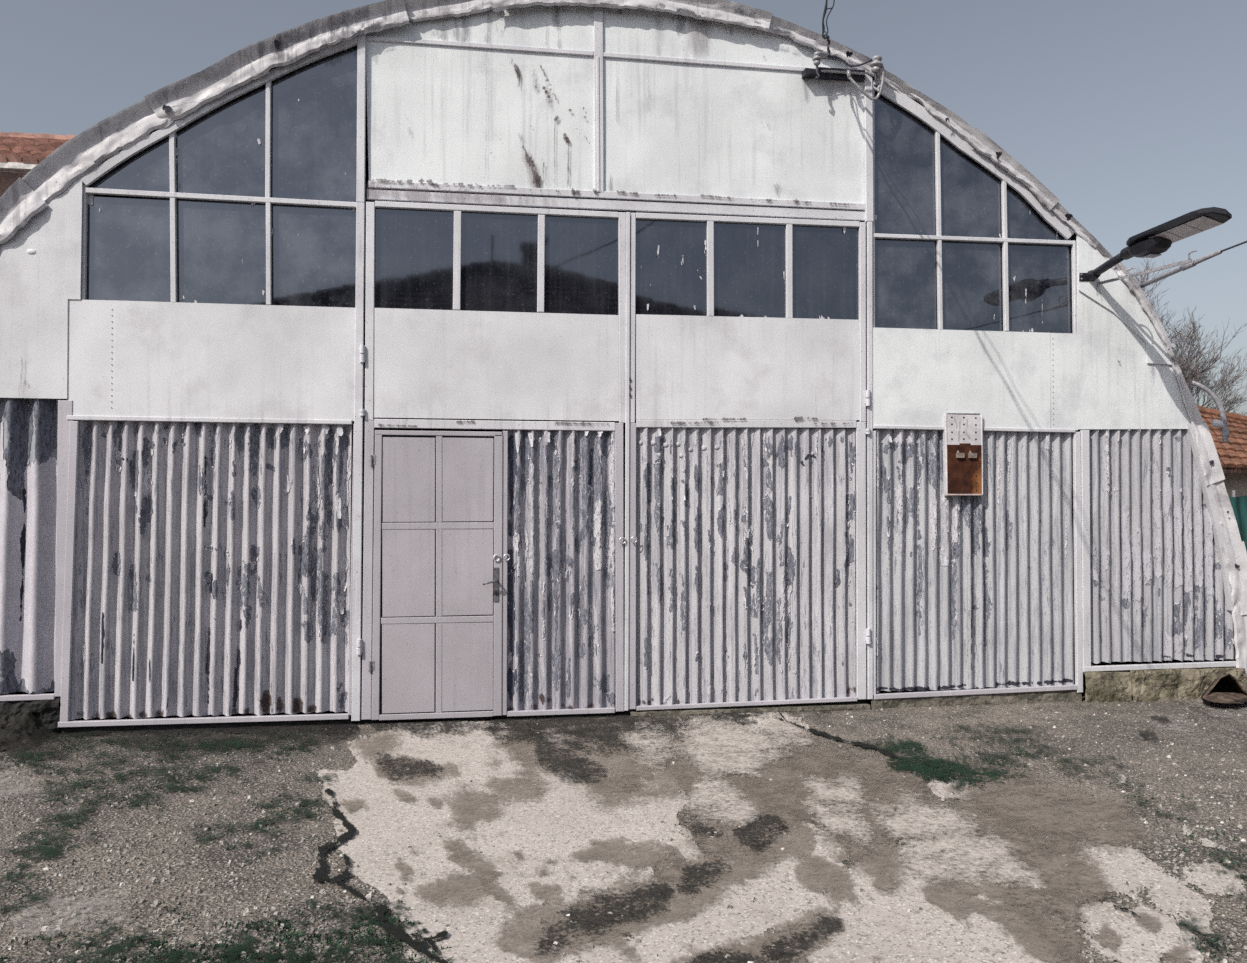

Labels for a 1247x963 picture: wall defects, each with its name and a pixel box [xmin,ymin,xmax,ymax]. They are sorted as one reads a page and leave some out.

rust [370,178,514,187]
rust [523,146,544,191]
rust [554,107,598,195]
peeling [3,398,58,500]
peeling [82,421,350,646]
peeling [507,430,615,711]
peeling [638,429,795,678]
peeling [802,435,856,587]
rust [947,443,982,494]
peeling [950,461,1013,646]
peeling [1122,560,1240,650]
crack [312,789,450,963]